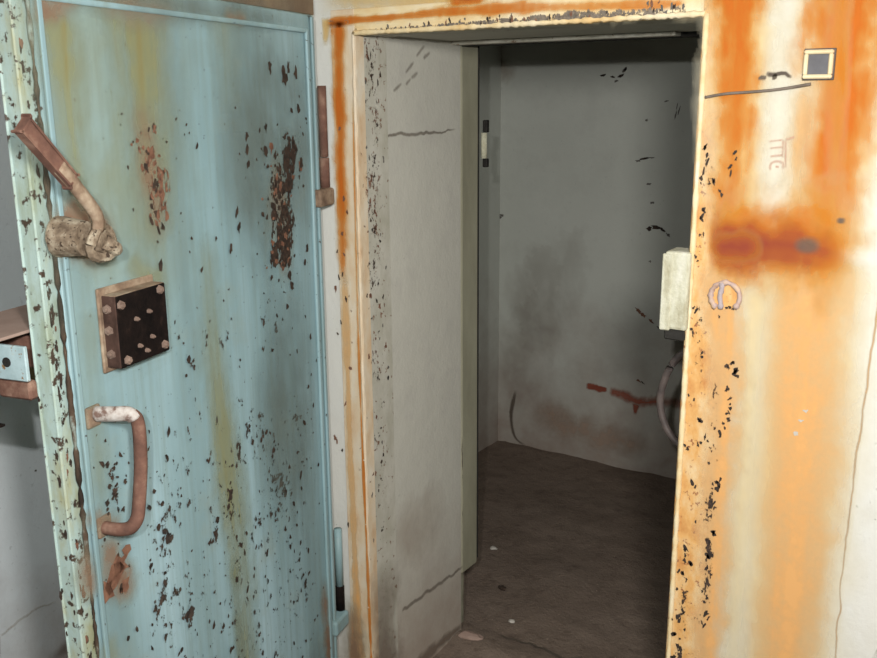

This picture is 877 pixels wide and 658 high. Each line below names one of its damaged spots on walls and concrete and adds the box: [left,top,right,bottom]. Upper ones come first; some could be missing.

corrosion [42,0,70,21]
corrosion [323,0,681,278]
corrosion [59,201,92,224]
corrosion [695,0,877,658]
corrosion [587,383,681,413]
corrosion [342,285,372,658]
corrosion [322,593,333,658]
crack [502,635,582,658]